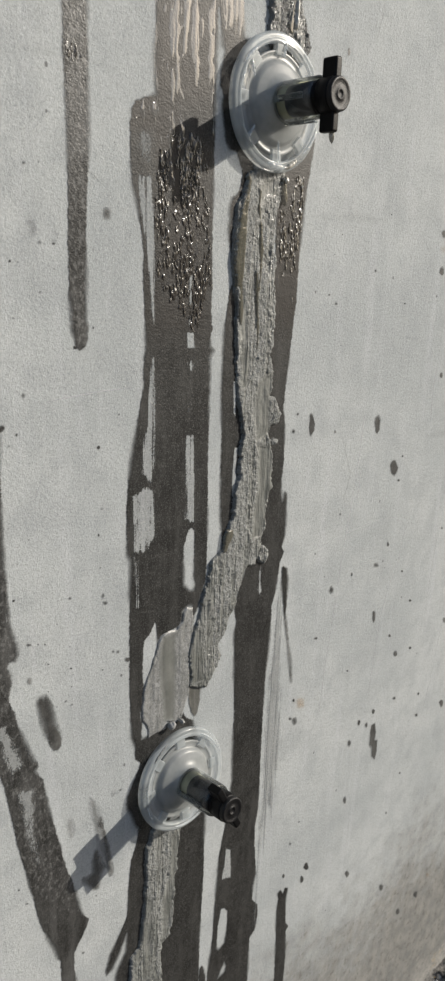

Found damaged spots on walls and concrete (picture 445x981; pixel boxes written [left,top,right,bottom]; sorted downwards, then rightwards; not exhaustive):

water stain [62,0,89,350]
water stain [0,479,112,981]
water stain [106,0,315,981]